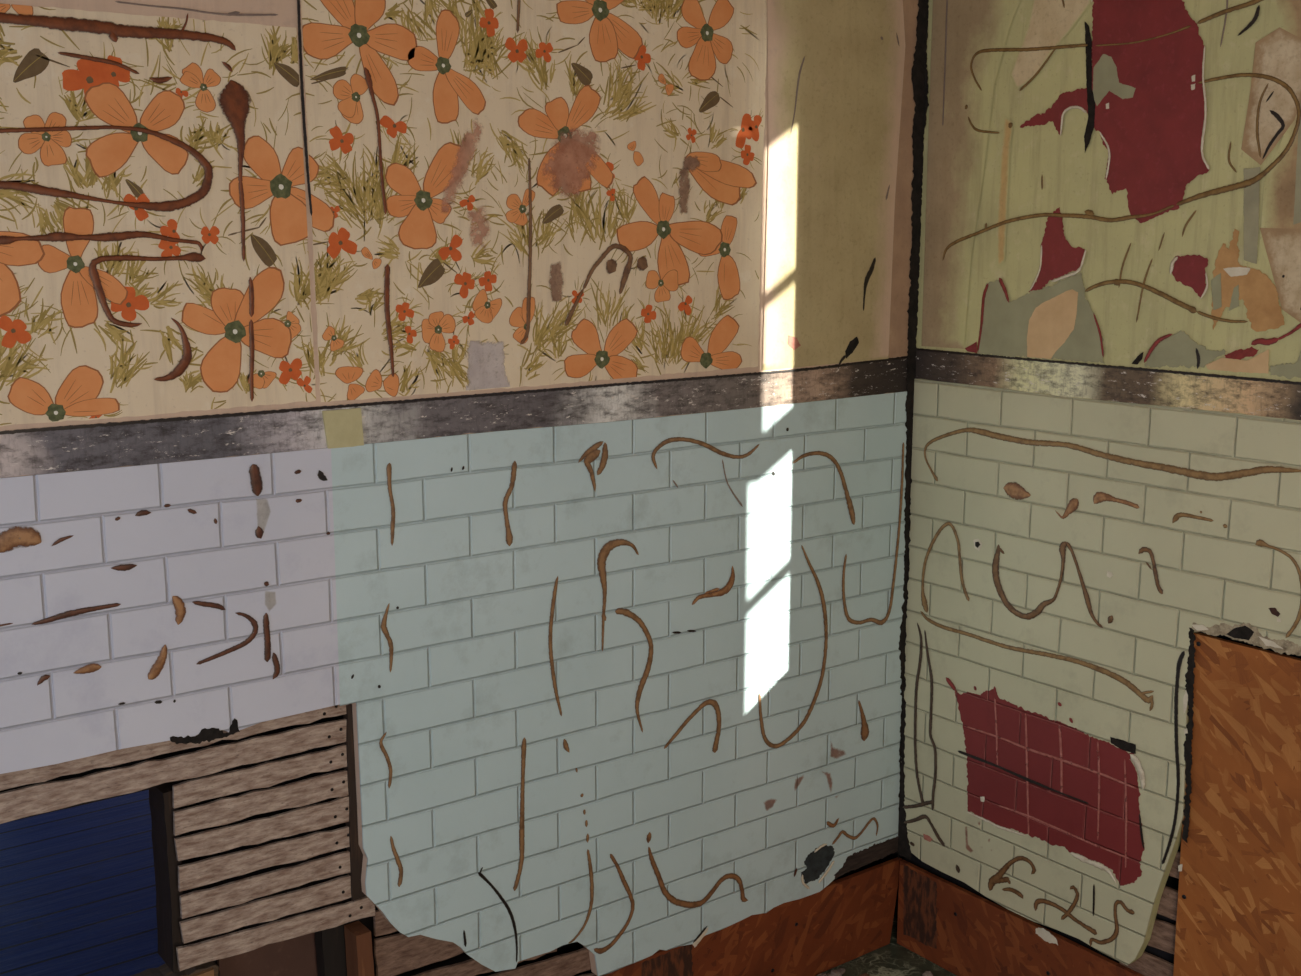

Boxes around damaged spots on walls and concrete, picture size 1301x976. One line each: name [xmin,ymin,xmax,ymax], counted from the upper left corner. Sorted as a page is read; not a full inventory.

peeling [921,0,1210,364]
peeling [1132,102,1301,374]
peeling [838,337,859,369]
crack [722,459,743,507]
flaking render [170,718,240,744]
peeling [946,677,1146,886]
crack [1162,651,1185,864]
flaking render [1182,622,1301,843]
crack [478,867,518,962]
peeling [693,926,708,947]
flaking render [794,836,898,889]
crack [1090,885,1098,916]